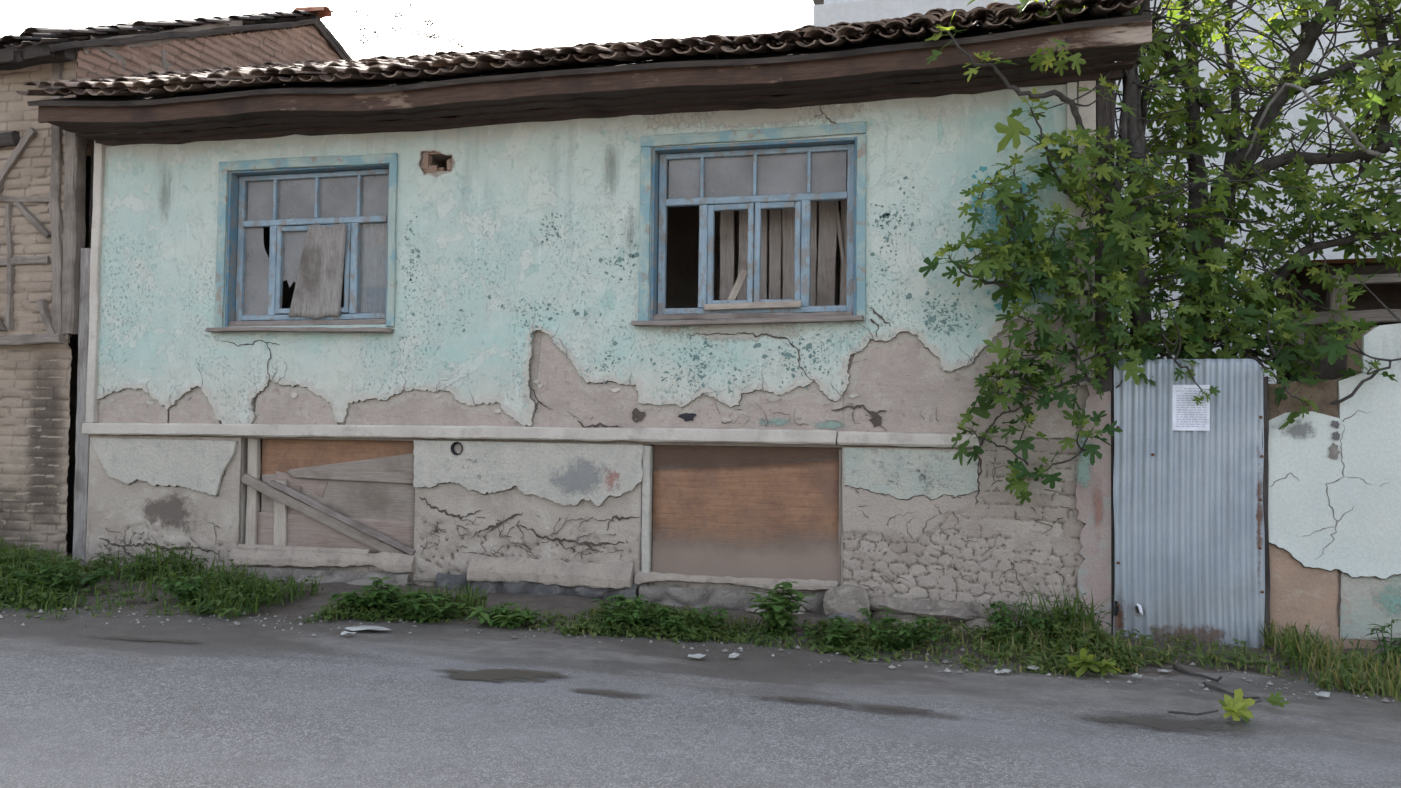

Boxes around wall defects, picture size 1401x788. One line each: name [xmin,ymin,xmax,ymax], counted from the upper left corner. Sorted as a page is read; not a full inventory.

spalling [418,150,455,178]
peeling [587,219,639,283]
spalling [86,361,241,576]
spalling [252,269,1091,617]
crack [1270,410,1390,559]
spalling [1328,421,1341,460]
spalling [1269,542,1401,650]